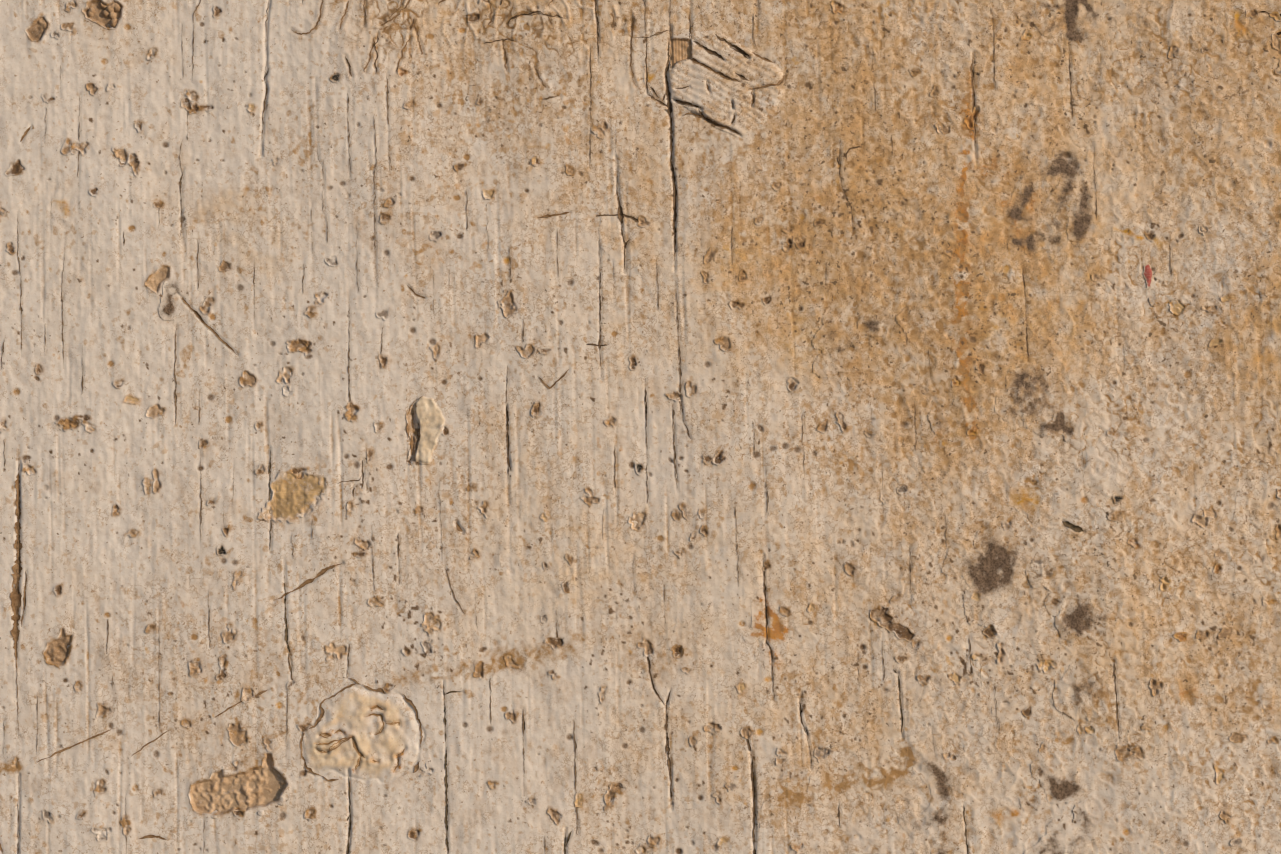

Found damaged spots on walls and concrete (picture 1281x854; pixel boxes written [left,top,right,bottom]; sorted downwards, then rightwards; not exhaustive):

spalling [25,0,123,42]
crack [583,0,616,163]
crack [1,211,83,394]
crack [587,188,642,380]
crack [603,0,691,514]
peeling [289,467,309,480]
leakage [598,0,1281,854]
crack [3,442,38,754]
spalling [43,628,73,668]
corrosion [742,591,799,685]
spalling [188,722,309,819]